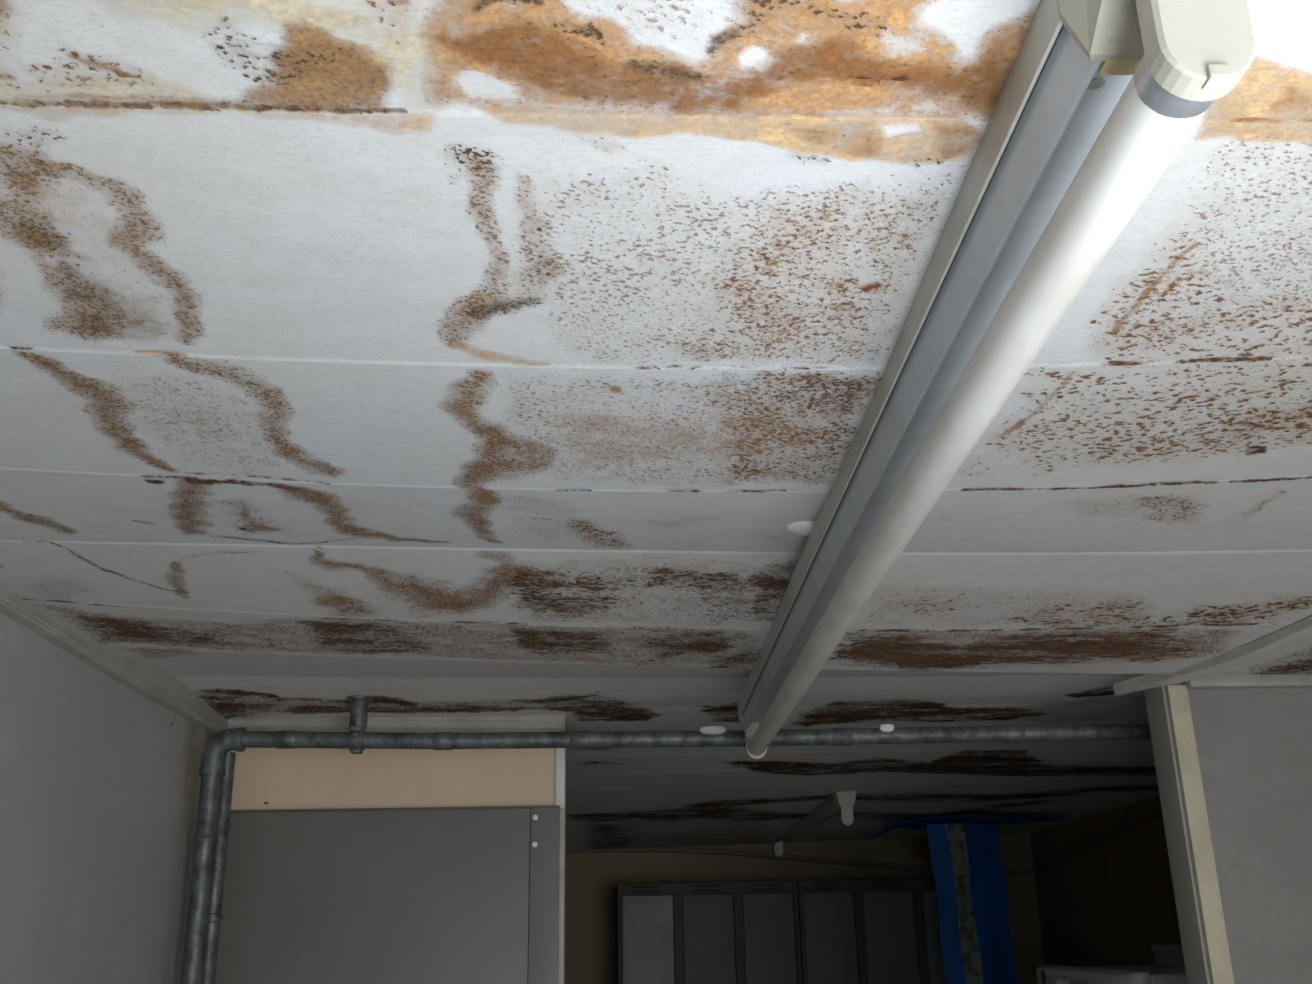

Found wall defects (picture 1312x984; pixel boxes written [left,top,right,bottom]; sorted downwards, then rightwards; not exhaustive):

water stain [959,58,1312,522]
water stain [0,0,1033,669]
crack [23,541,188,599]
water stain [828,587,1312,675]
water stain [197,688,351,720]
water stain [368,693,666,721]
water stain [703,703,739,723]
water stain [794,699,1046,727]
water stain [1064,686,1115,703]